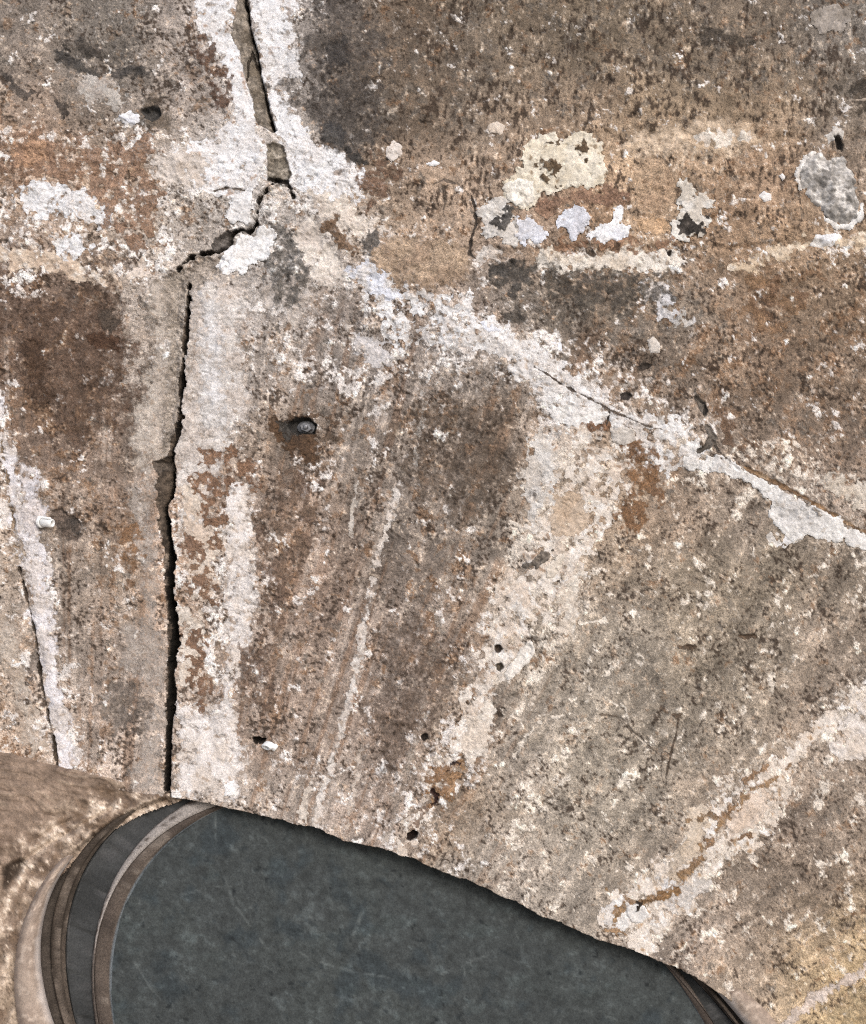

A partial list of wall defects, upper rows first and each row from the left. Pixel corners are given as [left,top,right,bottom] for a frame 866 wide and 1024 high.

crack [231,0,277,133]
peeling [475,131,632,248]
peeling [670,177,716,242]
crack [0,428,58,765]
crack [152,183,274,794]
rust [174,443,327,714]
water stain [0,0,696,857]
crack [533,366,662,430]
rust [602,756,793,937]